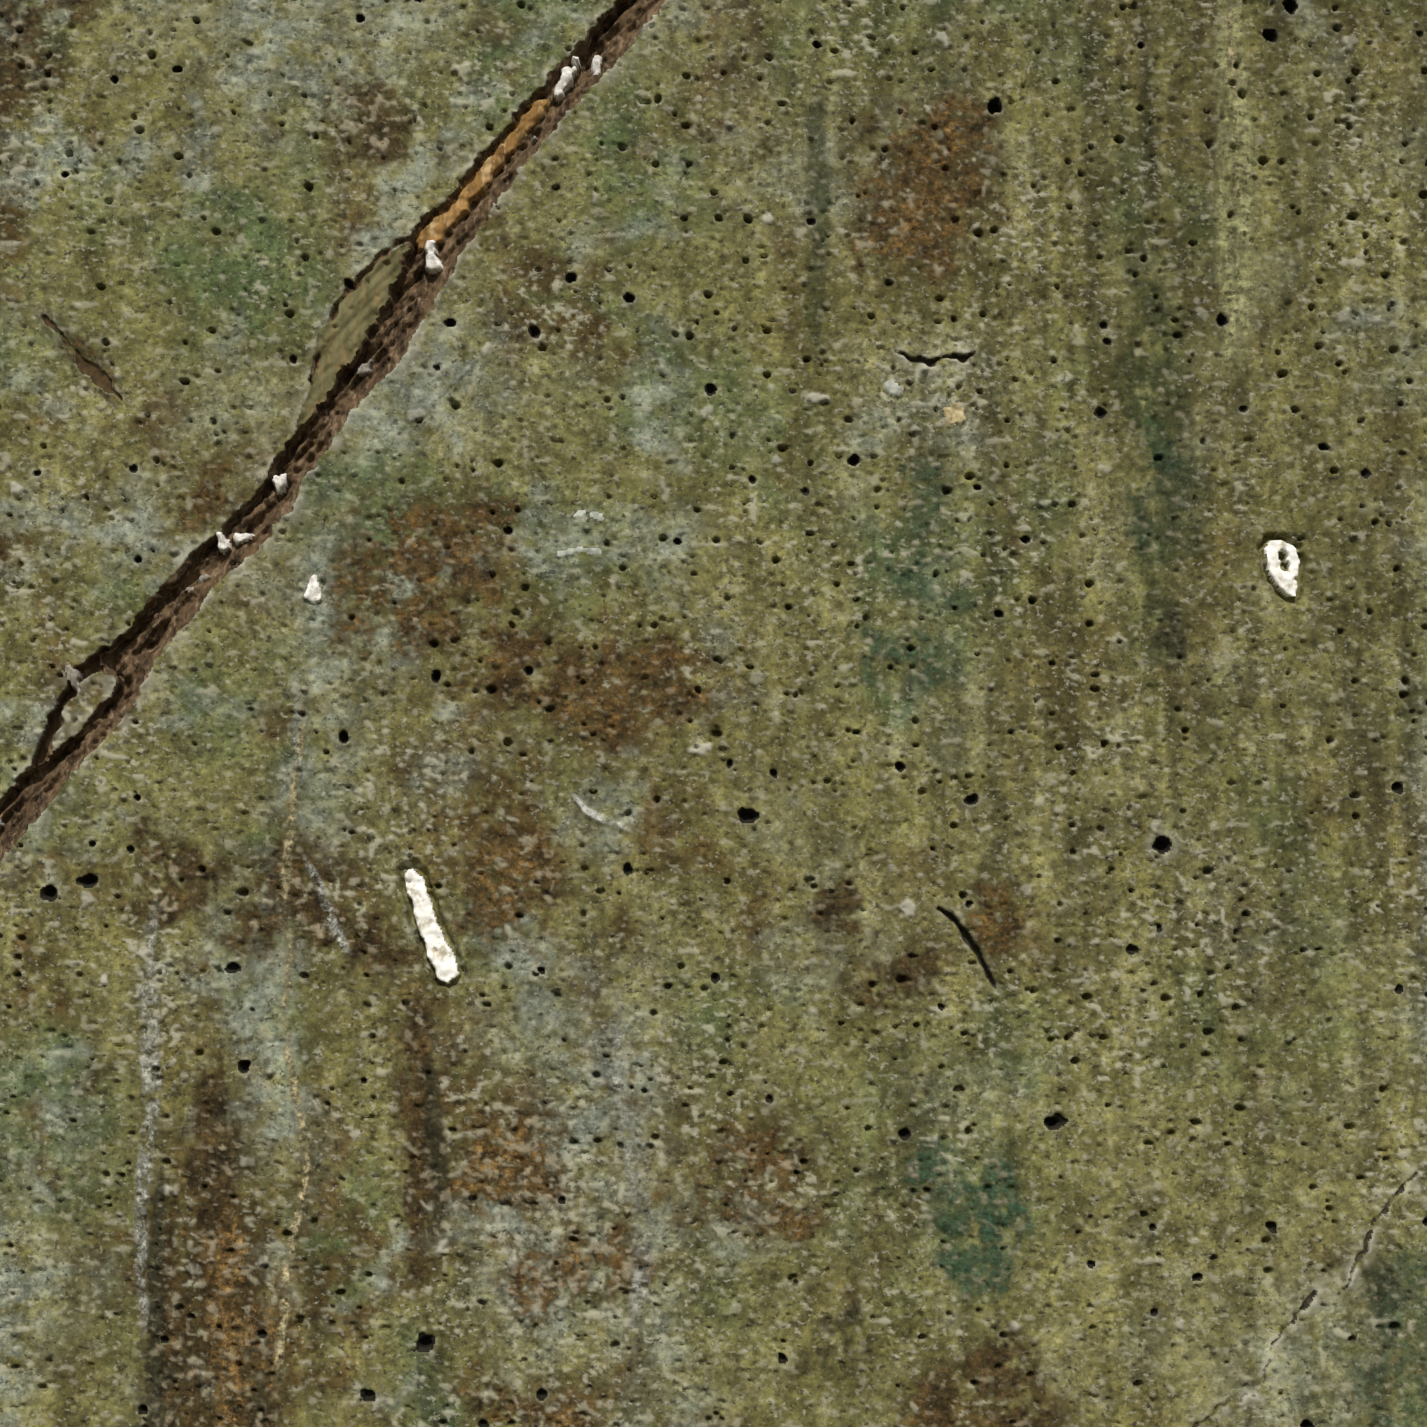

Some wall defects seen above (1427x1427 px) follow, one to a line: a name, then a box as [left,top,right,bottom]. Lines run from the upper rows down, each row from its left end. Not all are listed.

rust [850,95,999,280]
crack [0,0,665,861]
crack [937,907,996,987]
rust [141,1062,282,1427]